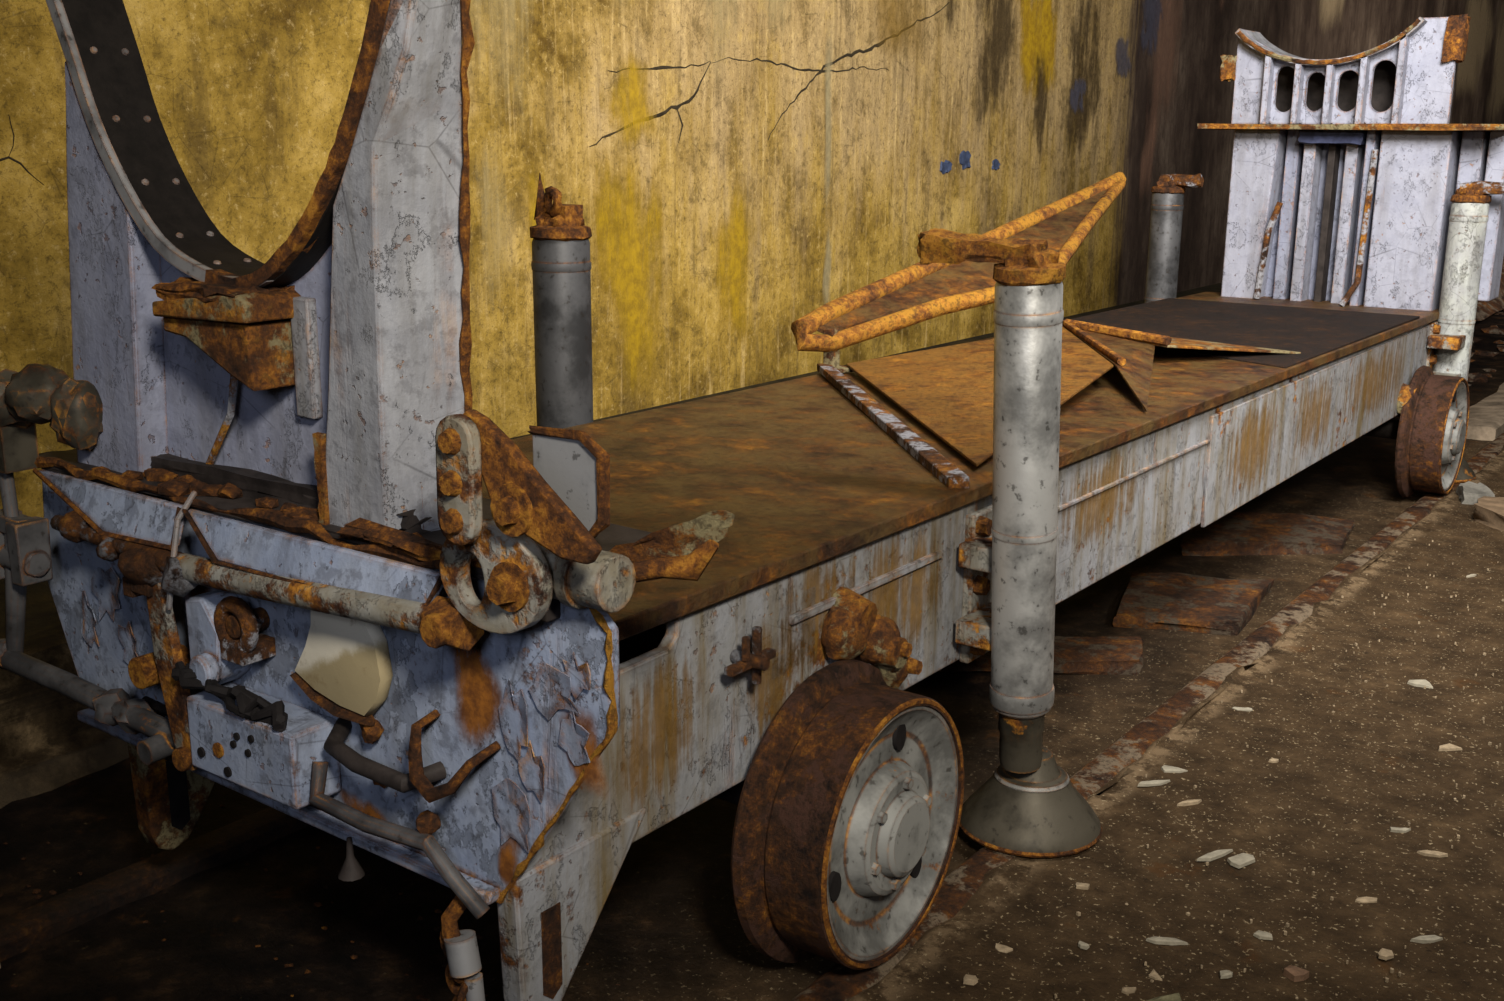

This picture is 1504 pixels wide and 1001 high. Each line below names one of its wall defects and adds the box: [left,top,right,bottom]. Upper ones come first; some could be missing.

crack [589,2,949,147]
damp [978,0,1014,119]
damp [1034,60,1047,152]
damp [1068,1,1099,149]